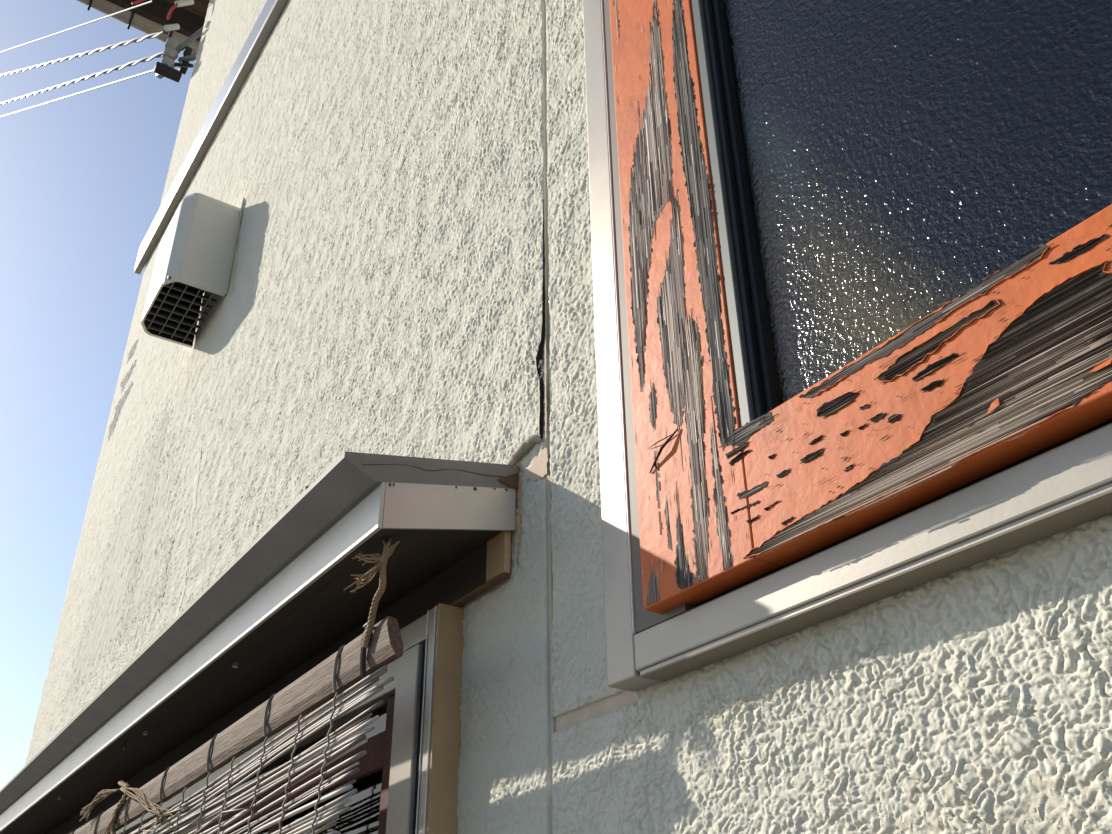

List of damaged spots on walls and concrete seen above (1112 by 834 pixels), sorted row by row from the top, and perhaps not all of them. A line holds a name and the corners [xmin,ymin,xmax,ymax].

crack [536,182,545,439]
peeling [622,0,1112,606]